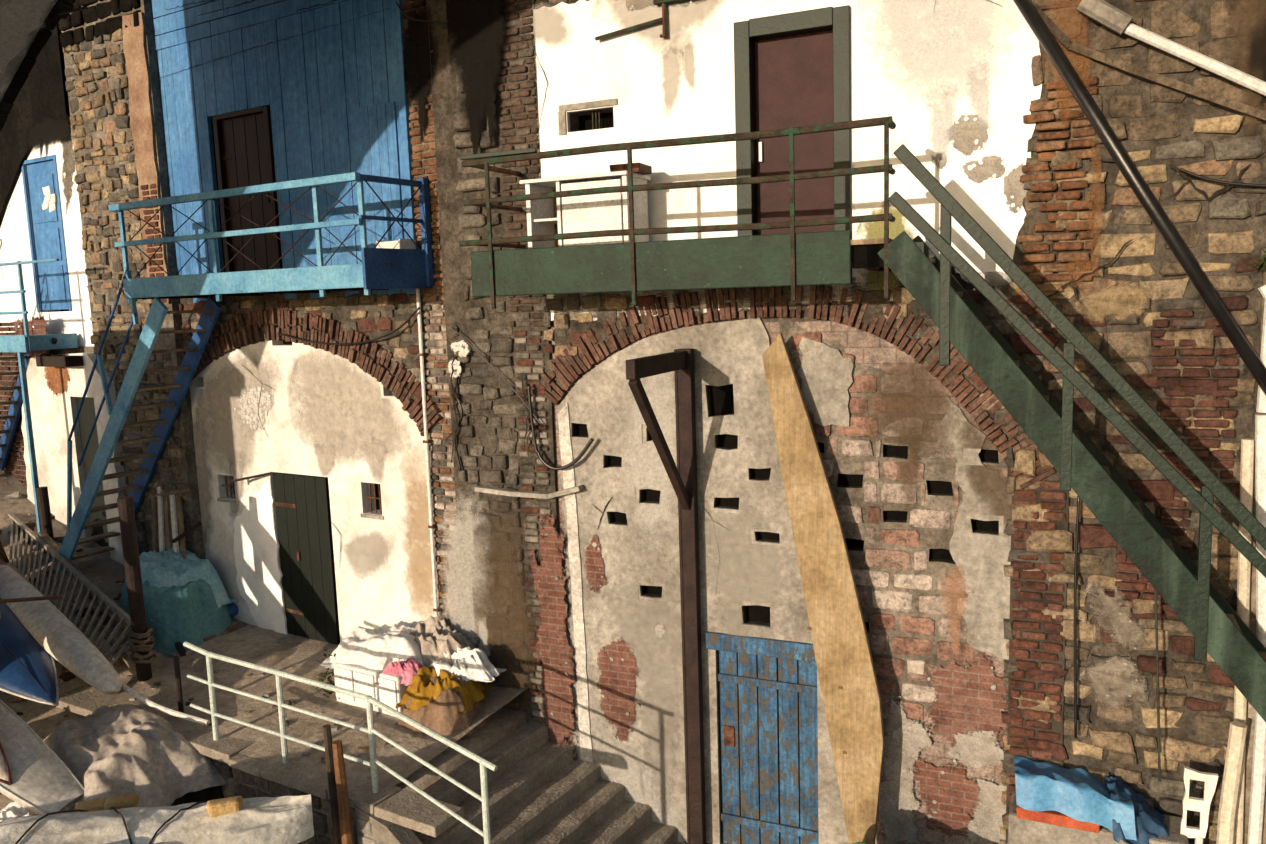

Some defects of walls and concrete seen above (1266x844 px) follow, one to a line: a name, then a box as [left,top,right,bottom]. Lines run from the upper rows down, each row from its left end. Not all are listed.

leakage [418,90,426,140]
leakage [470,61,496,154]
leakage [883,0,993,126]
leakage [932,100,952,158]
flaking render [11,314,48,335]
spalling [14,350,70,396]
flaking render [584,535,608,593]
flaking render [524,509,577,760]
flaking render [596,637,641,742]
flaking render [904,653,1008,839]